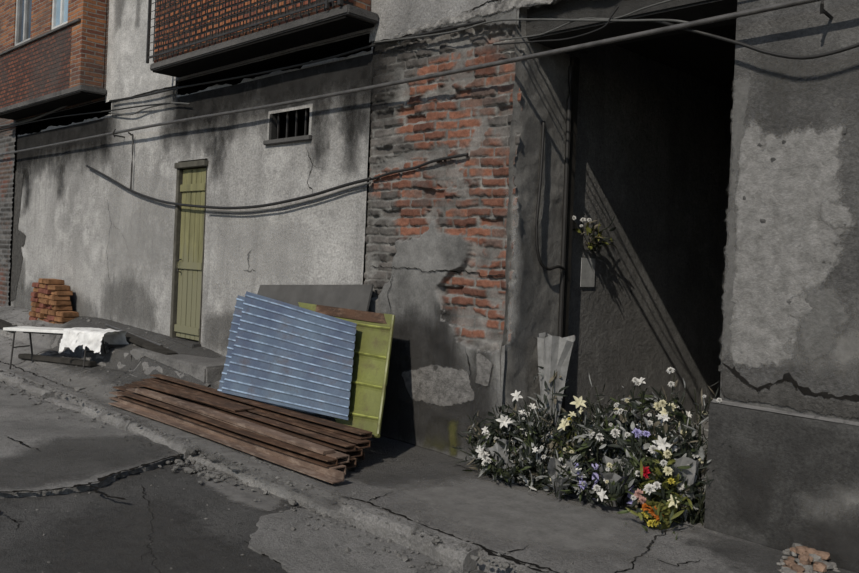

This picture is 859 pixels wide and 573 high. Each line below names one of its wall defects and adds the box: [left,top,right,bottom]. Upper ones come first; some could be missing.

spalling [395,0,553,36]
flaking render [718,78,859,419]
crack [723,363,859,401]
crack [0,454,184,530]
crack [333,492,559,573]
crack [614,530,702,573]